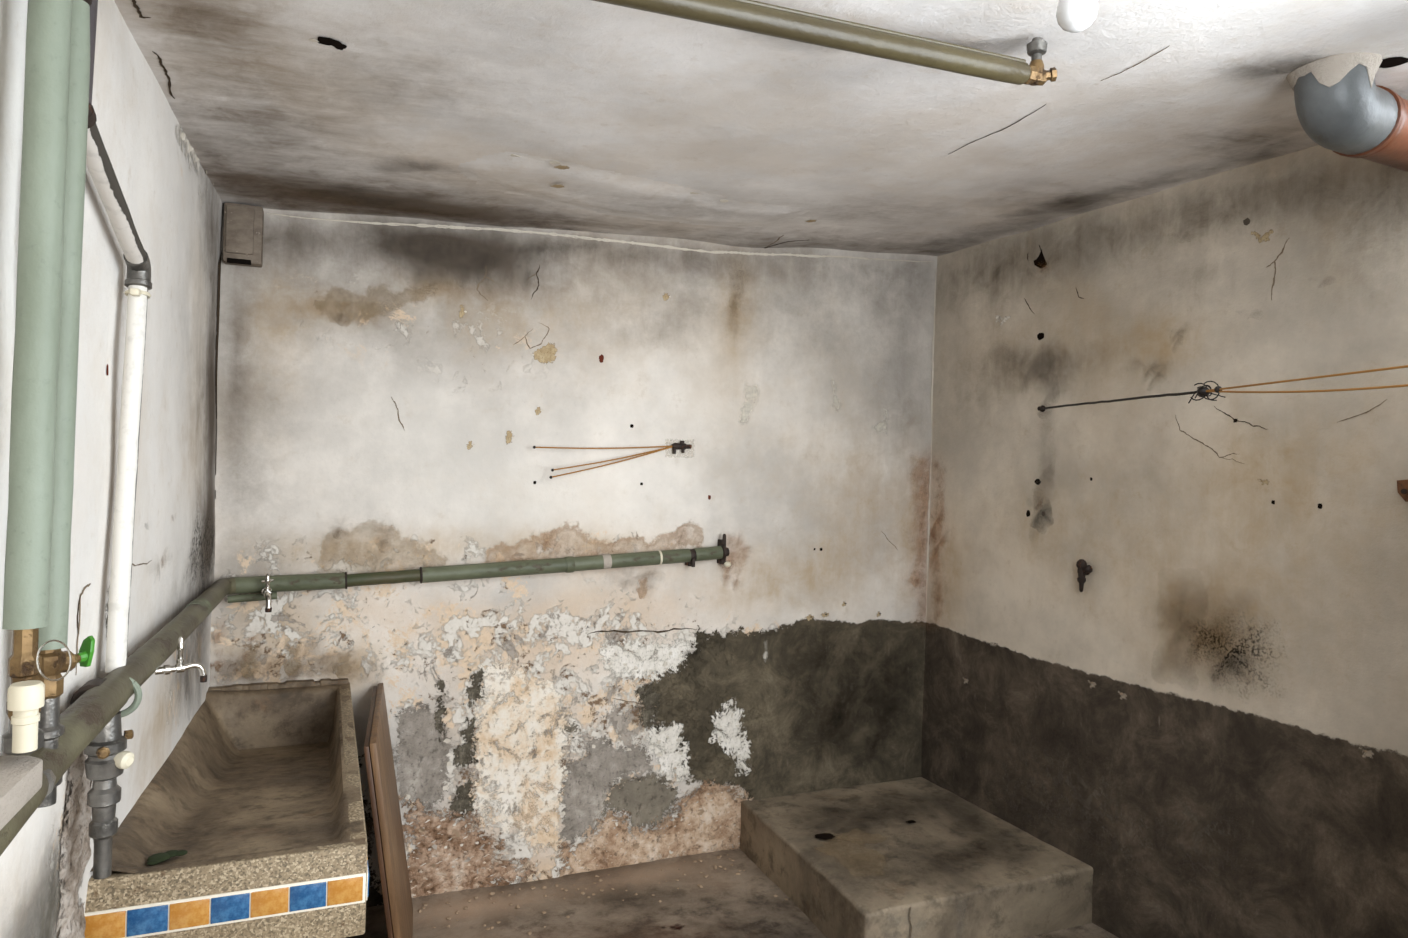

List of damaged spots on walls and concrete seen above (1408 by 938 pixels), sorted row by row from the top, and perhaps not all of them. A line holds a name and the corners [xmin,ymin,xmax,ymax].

crack [132,0,175,99]
crack [1101,45,1170,81]
crack [949,104,1046,154]
crack [1176,406,1268,464]
leakage [190,515,214,576]
leakage [1195,624,1266,678]
peeling [392,637,754,898]